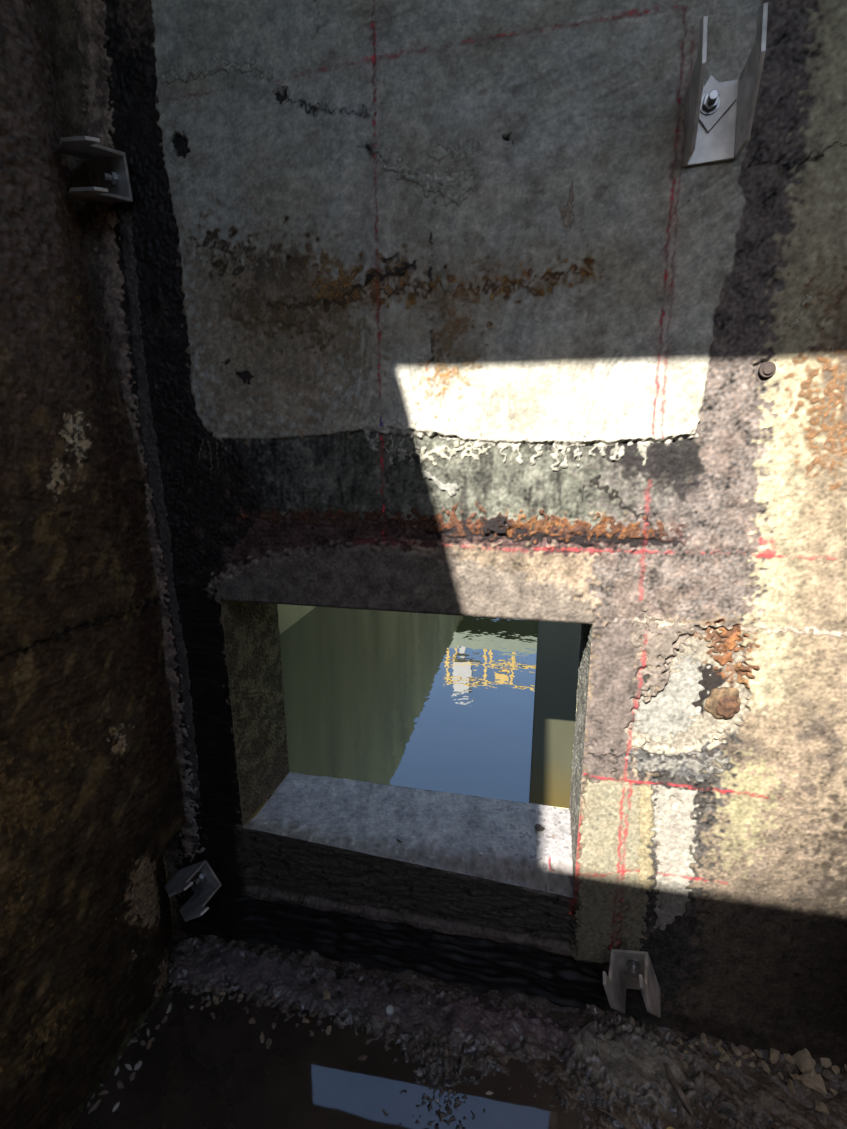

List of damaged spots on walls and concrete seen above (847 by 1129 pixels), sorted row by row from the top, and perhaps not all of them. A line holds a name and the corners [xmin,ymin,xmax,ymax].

rust [190,228,602,397]
rust [231,502,683,549]
rust [690,619,760,683]
spalling [622,609,759,894]